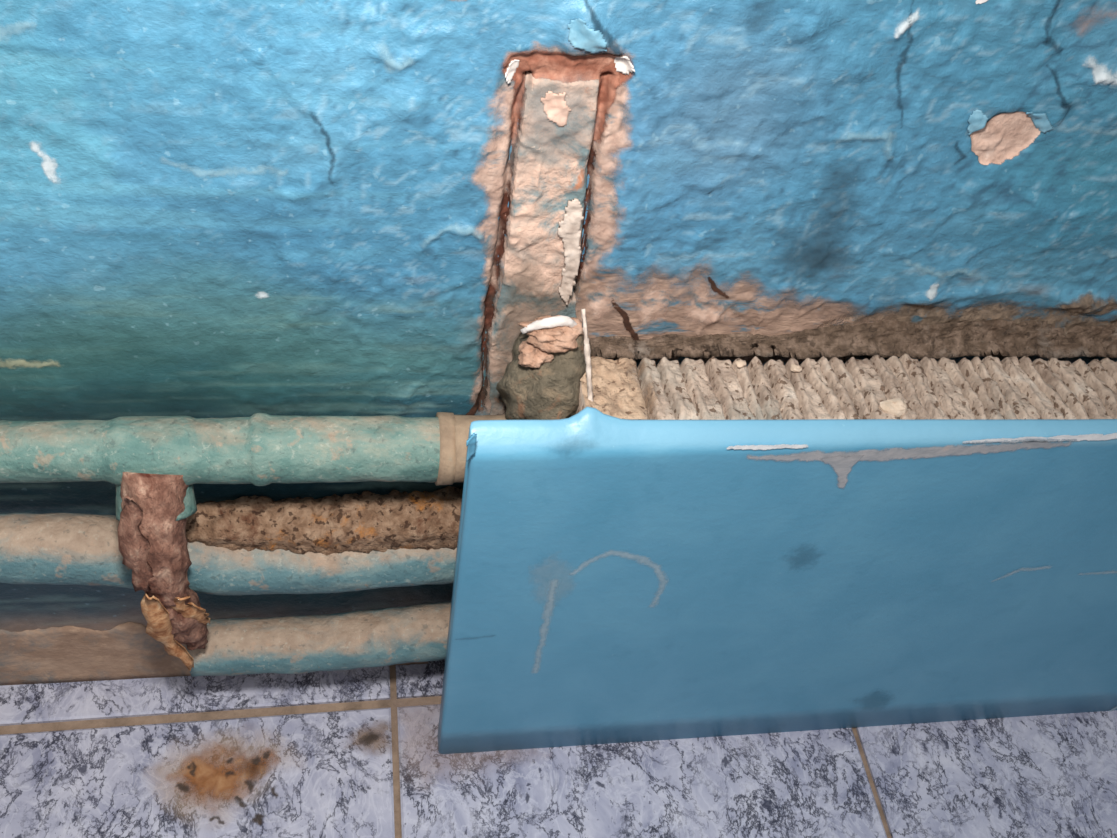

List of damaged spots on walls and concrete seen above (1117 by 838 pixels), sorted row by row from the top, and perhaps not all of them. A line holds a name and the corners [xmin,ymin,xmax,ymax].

corrosion [502,50,633,148]
crack [897,30,912,79]
crack [1046,0,1070,116]
peeling [472,18,1117,415]
peeling [727,433,1117,488]
corrosion [117,496,210,671]
corrosion [176,749,274,825]